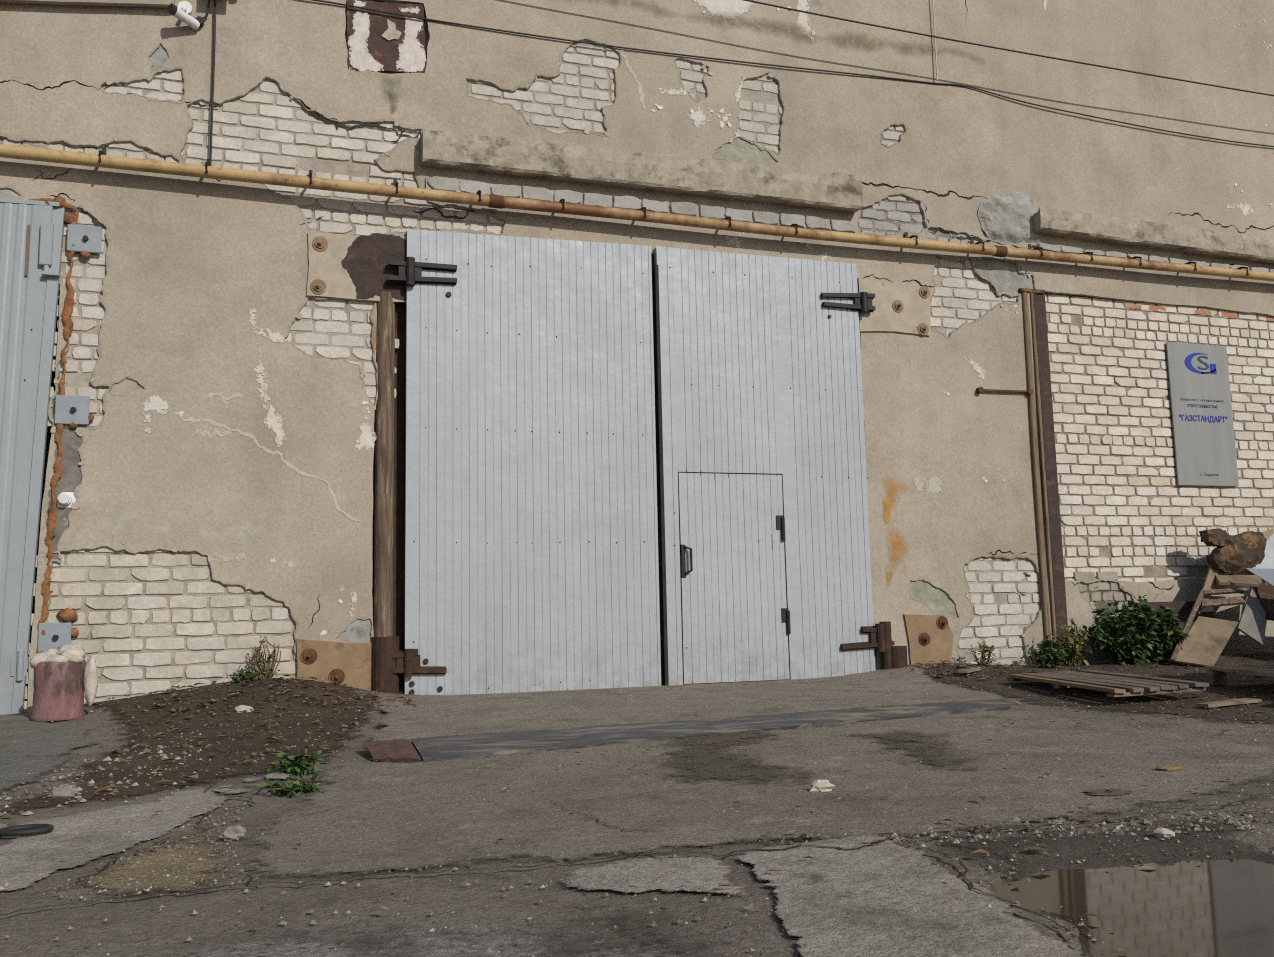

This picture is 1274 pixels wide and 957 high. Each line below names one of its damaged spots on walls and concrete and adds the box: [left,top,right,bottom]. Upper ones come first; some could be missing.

crack [0,80,107,91]
spalling [0,42,506,236]
peeling [348,0,427,73]
spalling [466,38,624,137]
spalling [651,56,785,166]
corrosion [342,233,406,300]
spalling [858,192,1037,339]
spalling [249,296,378,451]
spalling [31,201,300,705]
corrosion [884,483,902,522]
spalling [320,586,372,643]
spalling [909,555,1043,665]